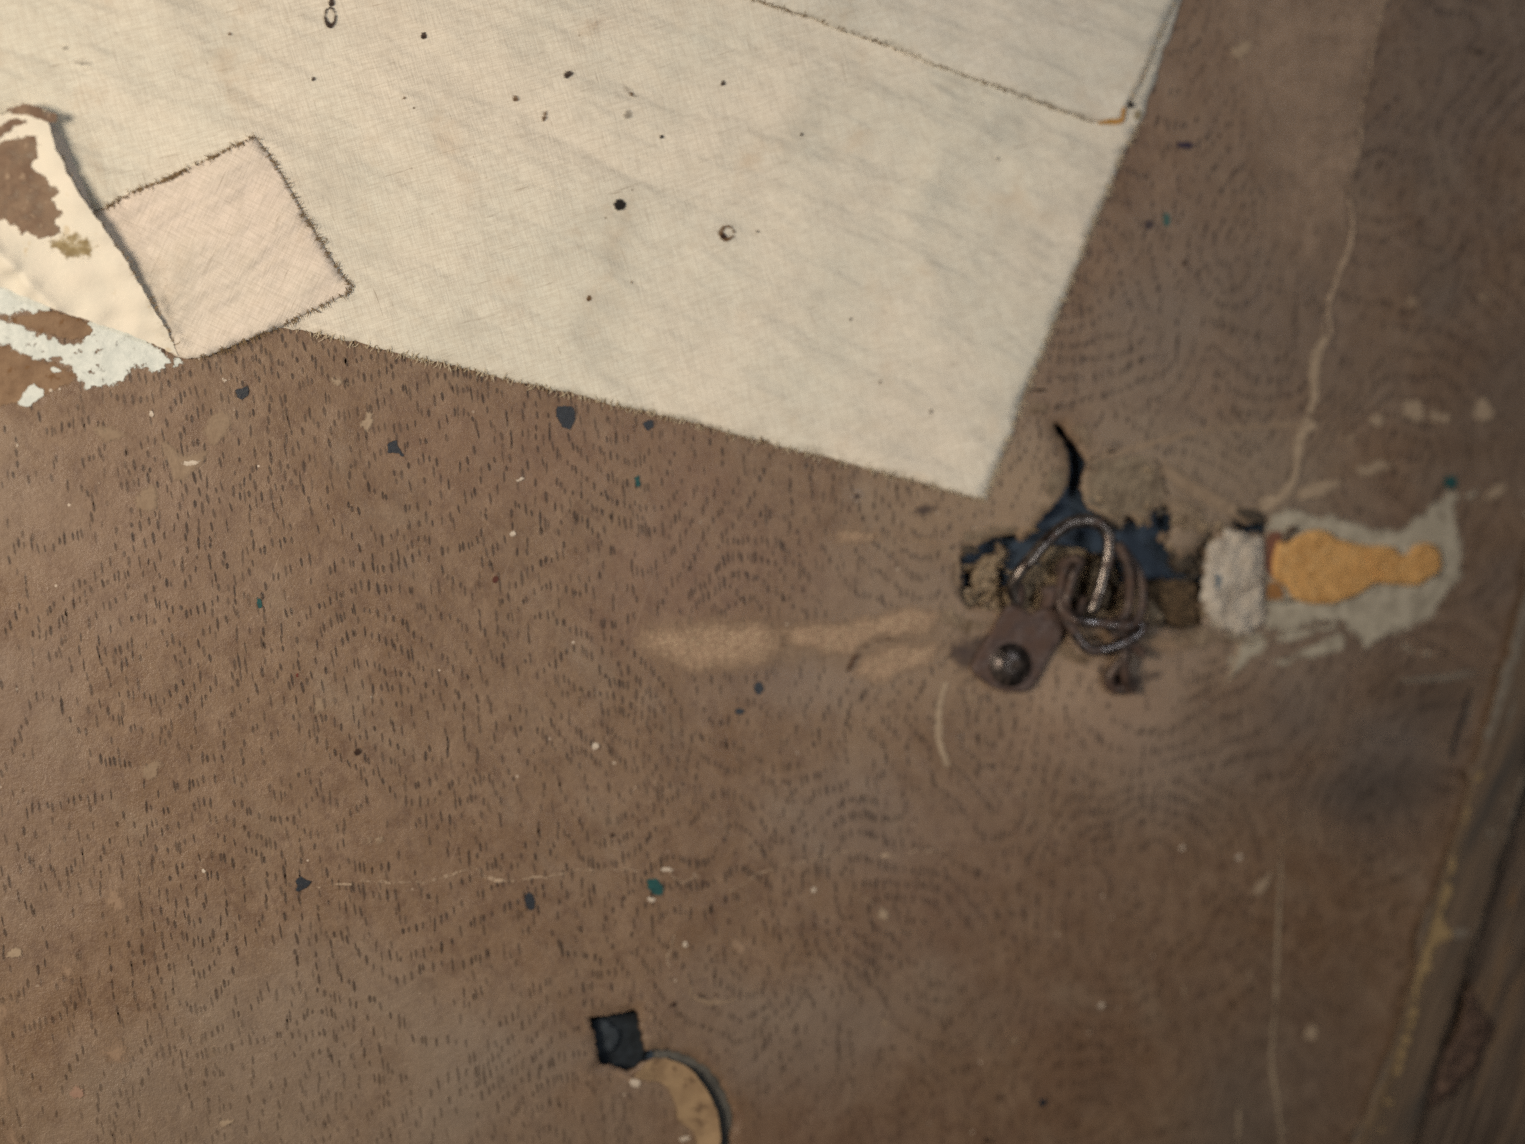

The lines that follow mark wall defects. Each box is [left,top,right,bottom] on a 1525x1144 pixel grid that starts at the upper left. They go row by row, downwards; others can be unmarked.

peeling [0,287,227,407]
crack [1067,0,1388,604]
spalling [943,424,1268,652]
spalling [590,1010,732,1144]